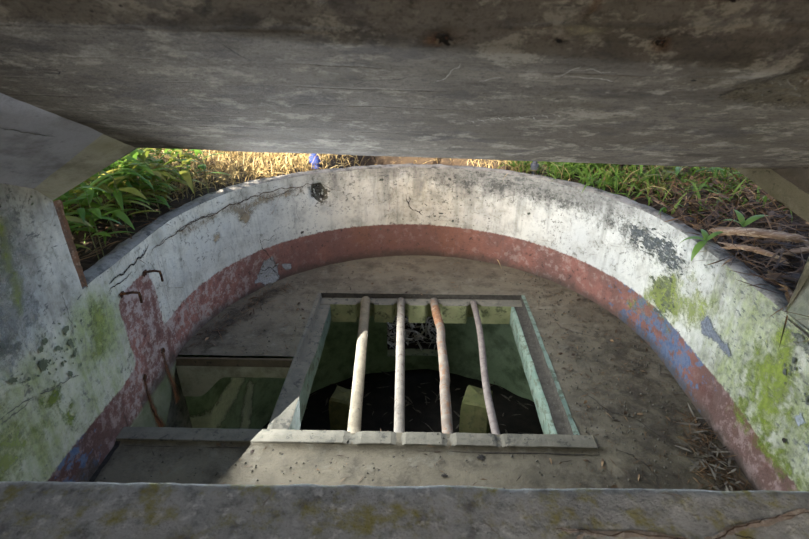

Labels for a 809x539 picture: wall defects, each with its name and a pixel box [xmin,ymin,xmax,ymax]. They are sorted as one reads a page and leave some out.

crack [109,183,333,313]
spalling [254,257,292,286]
peeling [700,316,731,358]
peeling [791,332,809,356]
damp [39,385,62,408]
rust [144,374,165,427]
crack [556,508,809,539]